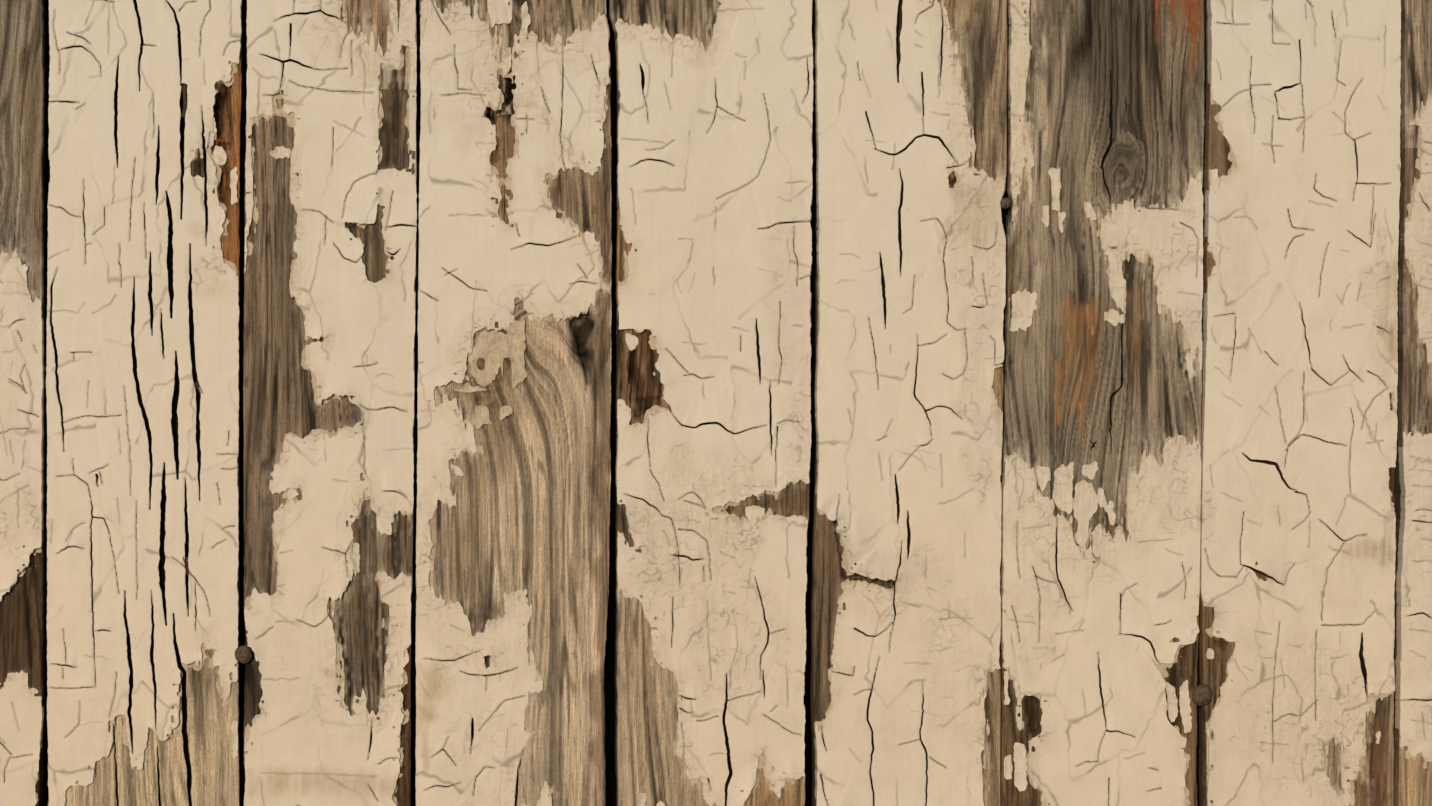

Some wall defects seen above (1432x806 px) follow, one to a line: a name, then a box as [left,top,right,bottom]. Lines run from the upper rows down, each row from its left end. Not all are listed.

peeling [0,530,44,707]
crack [9,0,238,806]
peeling [65,48,365,806]
crack [261,0,354,96]
peeling [320,71,717,806]
peeling [321,0,721,236]
crack [630,65,674,167]
crack [629,302,782,646]
crack [837,0,995,806]
peeling [924,0,1232,564]
crack [1225,267,1374,692]
peeling [1376,0,1432,447]